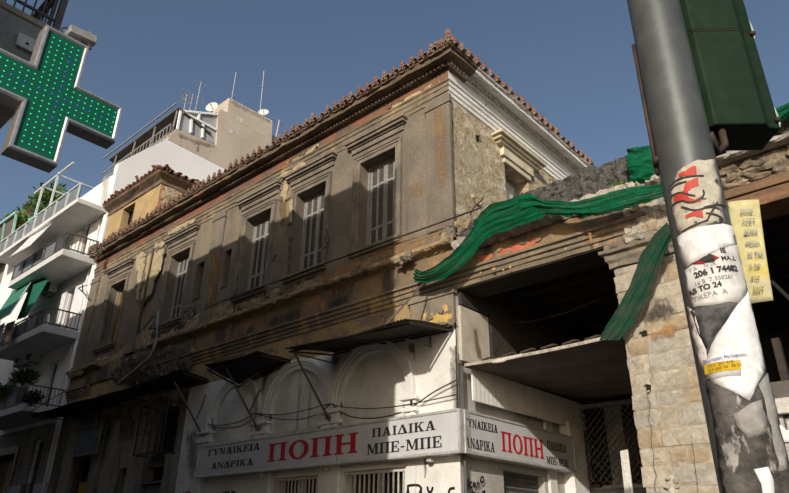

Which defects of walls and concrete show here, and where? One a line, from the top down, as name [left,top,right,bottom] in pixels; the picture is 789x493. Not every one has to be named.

flaking render [278,143,319,272]
flaking render [134,219,195,307]
peeling [474,238,542,273]
flaking render [95,309,200,367]
flaking render [212,276,318,320]
peeling [423,305,457,326]